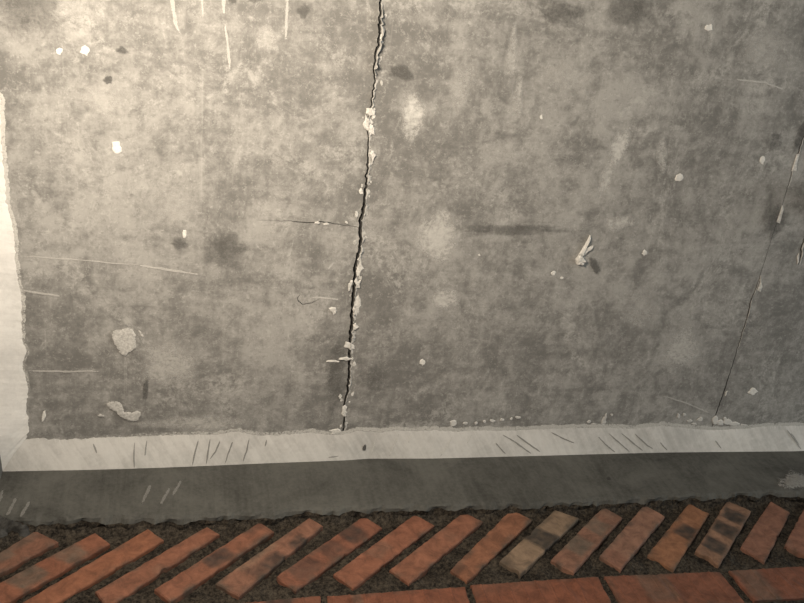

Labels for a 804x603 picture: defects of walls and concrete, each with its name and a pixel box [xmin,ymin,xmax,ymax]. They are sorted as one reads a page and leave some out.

crack [266,0,387,434]